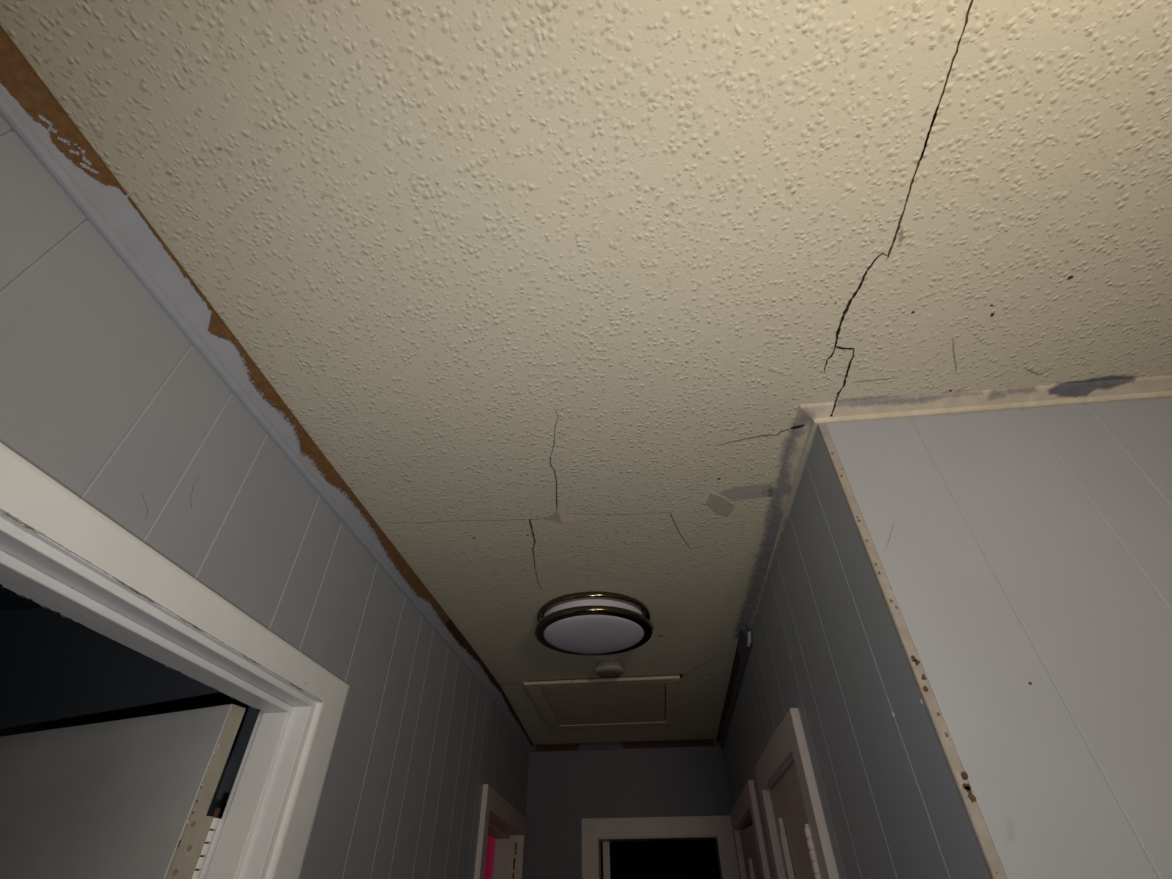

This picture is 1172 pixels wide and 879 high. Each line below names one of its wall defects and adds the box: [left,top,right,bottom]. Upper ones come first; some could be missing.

crack [0,508,321,701]
peeling [0,25,751,751]
crack [384,410,691,590]
crack [716,0,974,446]